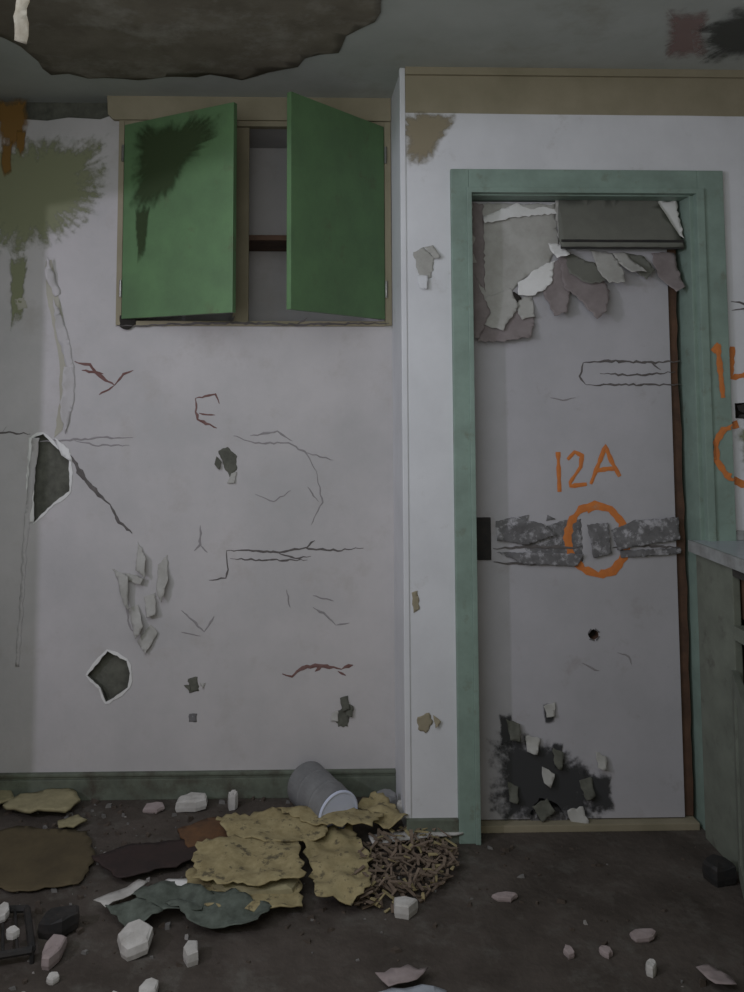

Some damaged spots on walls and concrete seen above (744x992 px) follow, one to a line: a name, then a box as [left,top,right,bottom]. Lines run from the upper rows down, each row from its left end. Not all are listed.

peeling [0,0,382,80]
leakage [667,12,744,59]
corrosion [0,100,27,174]
leakage [0,139,105,325]
peeling [472,201,686,343]
crack [74,361,133,395]
crack [550,359,682,401]
peeling [15,257,75,666]
crack [0,429,133,533]
flaking render [215,447,237,483]
crack [194,393,362,581]
flaking render [85,649,132,704]